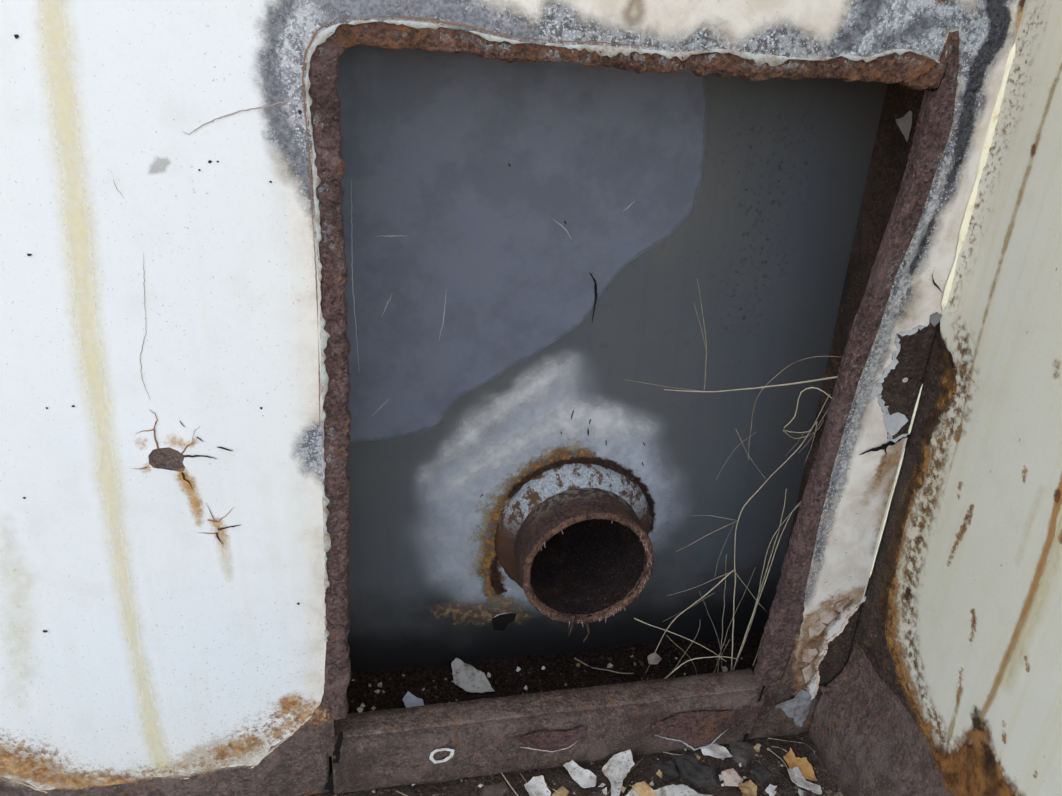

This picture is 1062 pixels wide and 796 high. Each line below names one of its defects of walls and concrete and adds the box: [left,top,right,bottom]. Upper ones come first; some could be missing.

water stain [151,159,168,172]
corrosion [302,15,649,319]
water stain [948,89,976,188]
corrosion [1016,133,1040,205]
water stain [47,0,126,593]
water stain [909,219,934,274]
corrosion [990,222,1013,296]
peeling [870,312,942,440]
spalling [133,410,216,522]
corrosion [430,442,655,625]
corrosion [873,328,1062,796]
peeling [775,587,865,727]